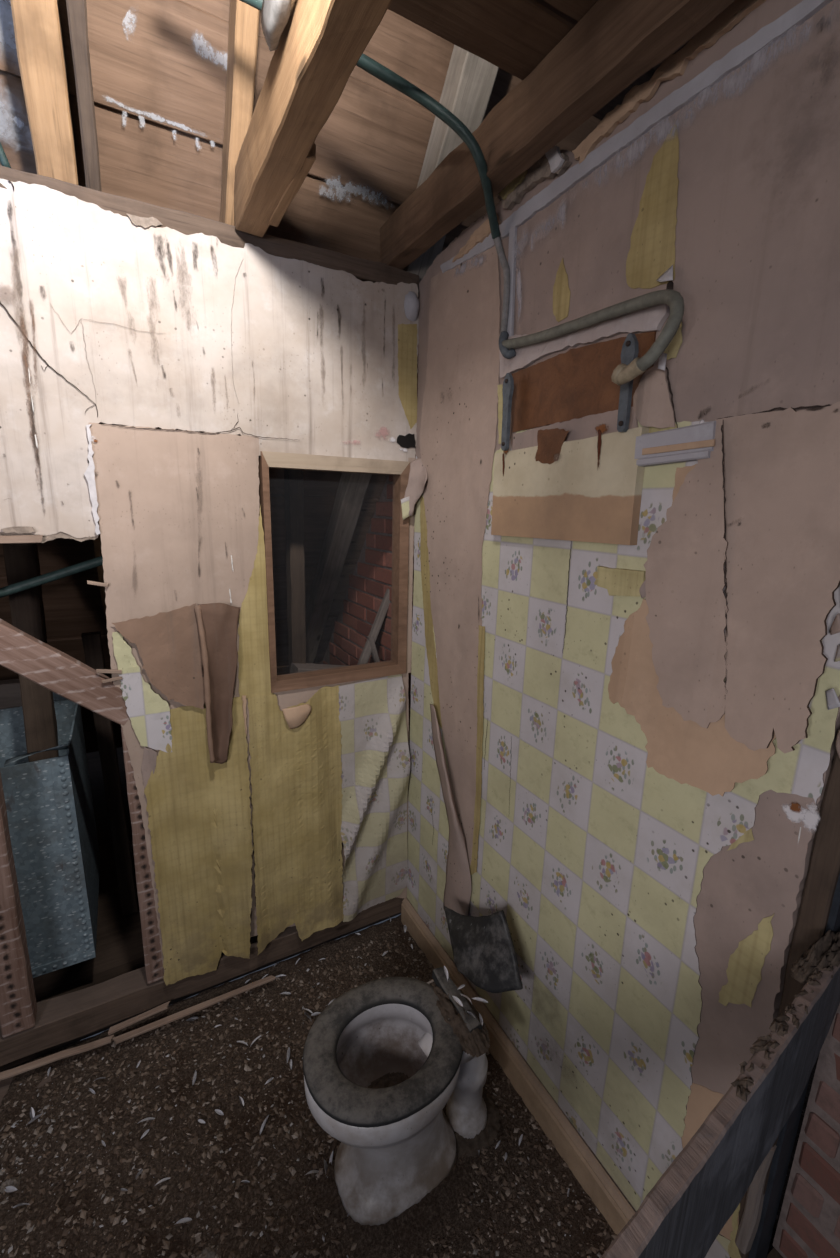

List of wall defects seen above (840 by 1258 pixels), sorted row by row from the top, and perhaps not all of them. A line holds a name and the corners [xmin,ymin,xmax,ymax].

leakage [0,0,16,49]
efflorescence [194,34,227,70]
leakage [0,101,23,138]
efflorescence [106,97,215,147]
spalling [452,0,766,262]
peeling [656,265,673,282]
leakage [8,203,44,503]
crack [0,265,292,440]
peeling [535,428,569,464]
crack [718,404,831,714]